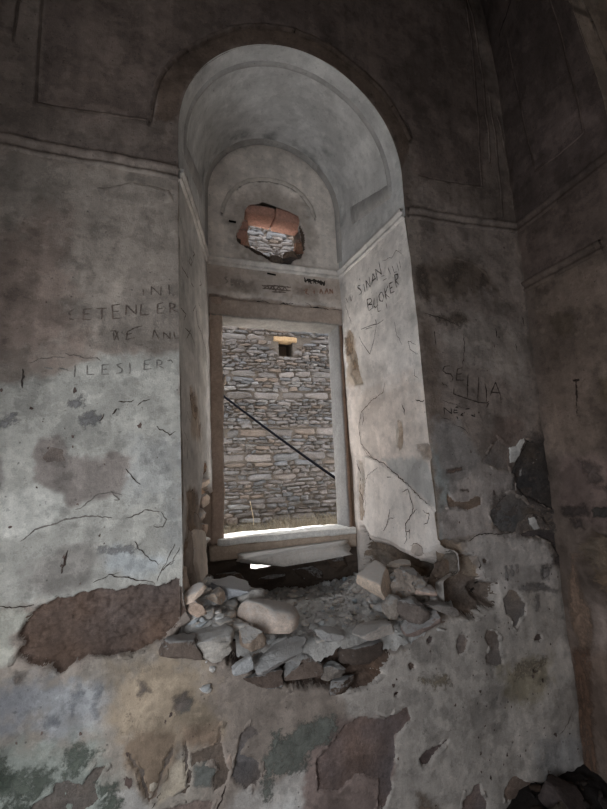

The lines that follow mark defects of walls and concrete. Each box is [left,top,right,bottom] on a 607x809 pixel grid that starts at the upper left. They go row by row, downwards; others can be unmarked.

flaking render [282,226,305,265]
crack [21,353,100,388]
crack [356,383,429,552]
crack [21,491,167,541]
crack [93,512,200,583]
flaking render [7,487,212,673]
spalling [222,642,261,672]
spalling [275,648,390,695]
flaking render [123,719,267,809]
flaking render [315,707,411,809]
flaking render [419,738,448,764]